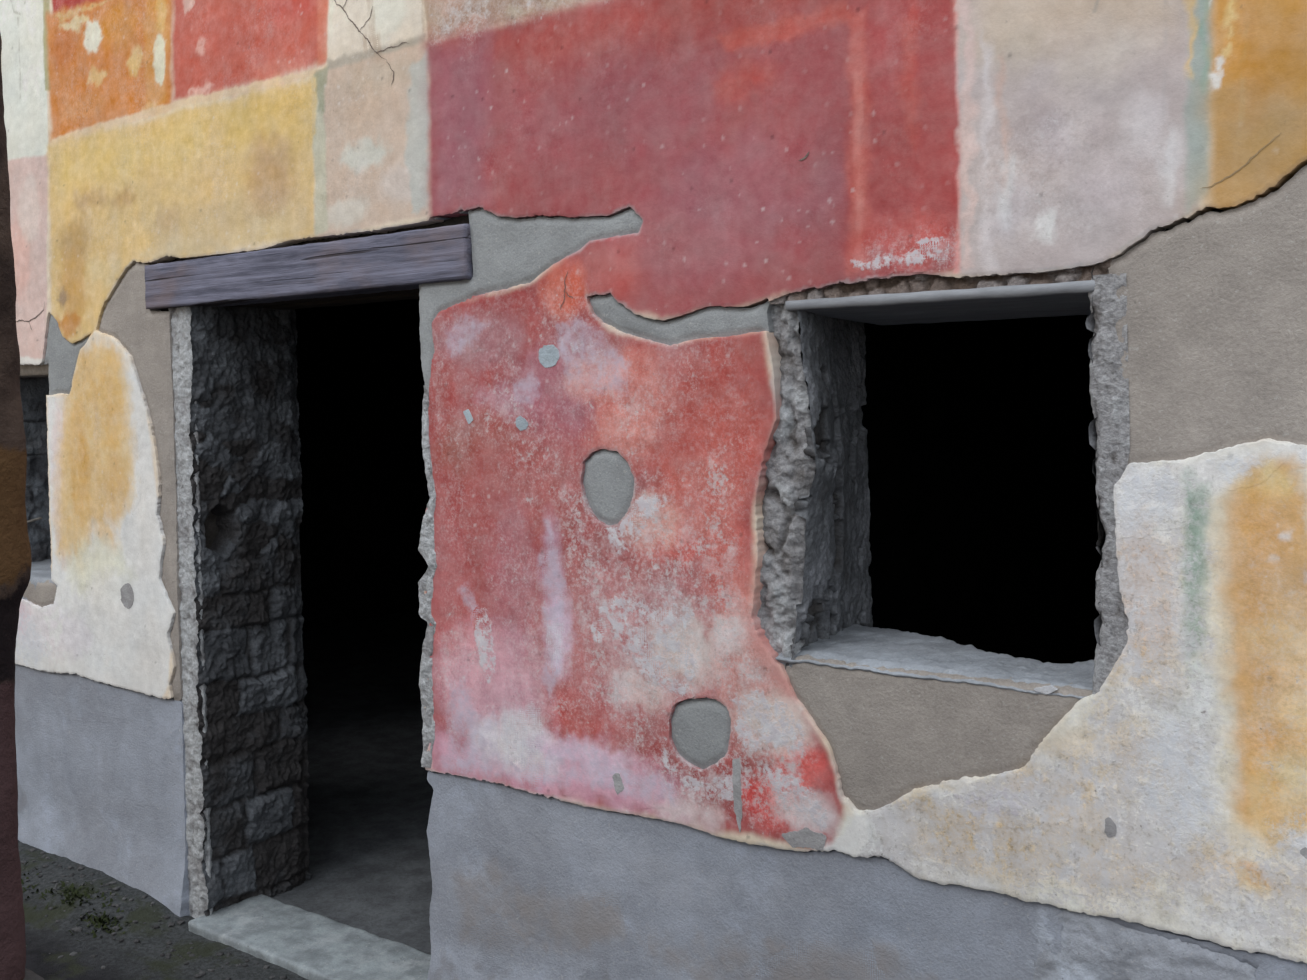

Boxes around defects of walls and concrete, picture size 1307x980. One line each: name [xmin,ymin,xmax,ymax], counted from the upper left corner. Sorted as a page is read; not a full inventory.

crack [334,0,407,85]
crack [1200,133,1281,189]
flaking render [418,208,643,768]
water stain [596,486,676,563]
flaking render [583,165,1307,810]
spalling [44,263,213,919]
water stain [427,512,951,980]
flaking render [671,697,742,832]
spalling [782,827,827,850]
spalling [1104,817,1117,837]
water stain [1014,901,1063,980]
spalling [1033,908,1257,980]